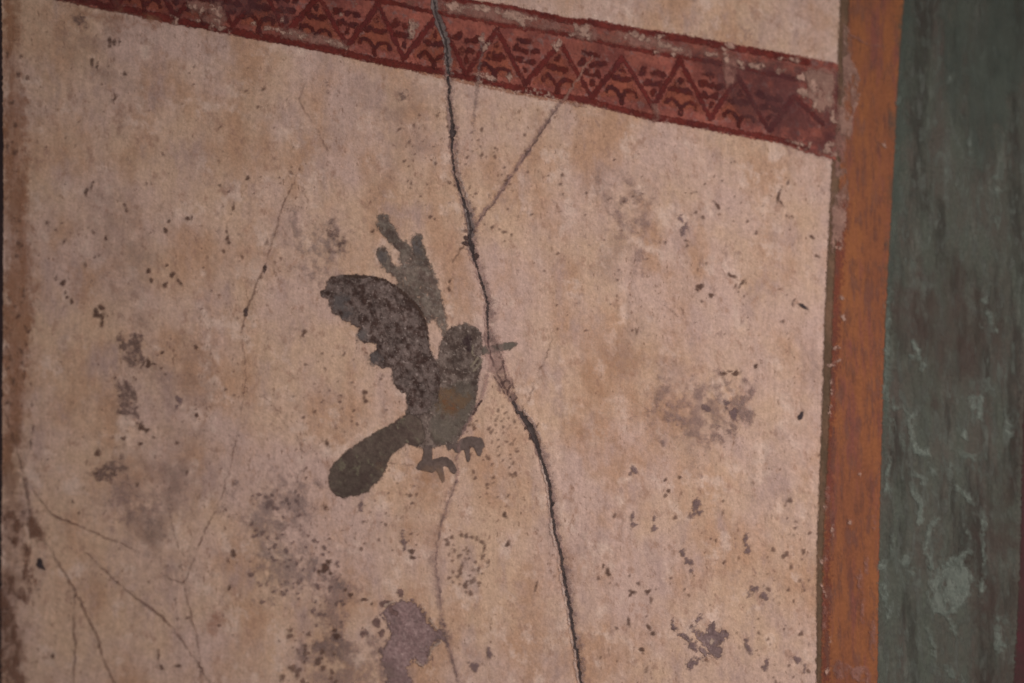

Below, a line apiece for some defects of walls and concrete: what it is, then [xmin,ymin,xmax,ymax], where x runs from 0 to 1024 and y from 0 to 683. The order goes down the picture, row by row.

crack [431,0,593,683]
peeling [705,26,860,250]